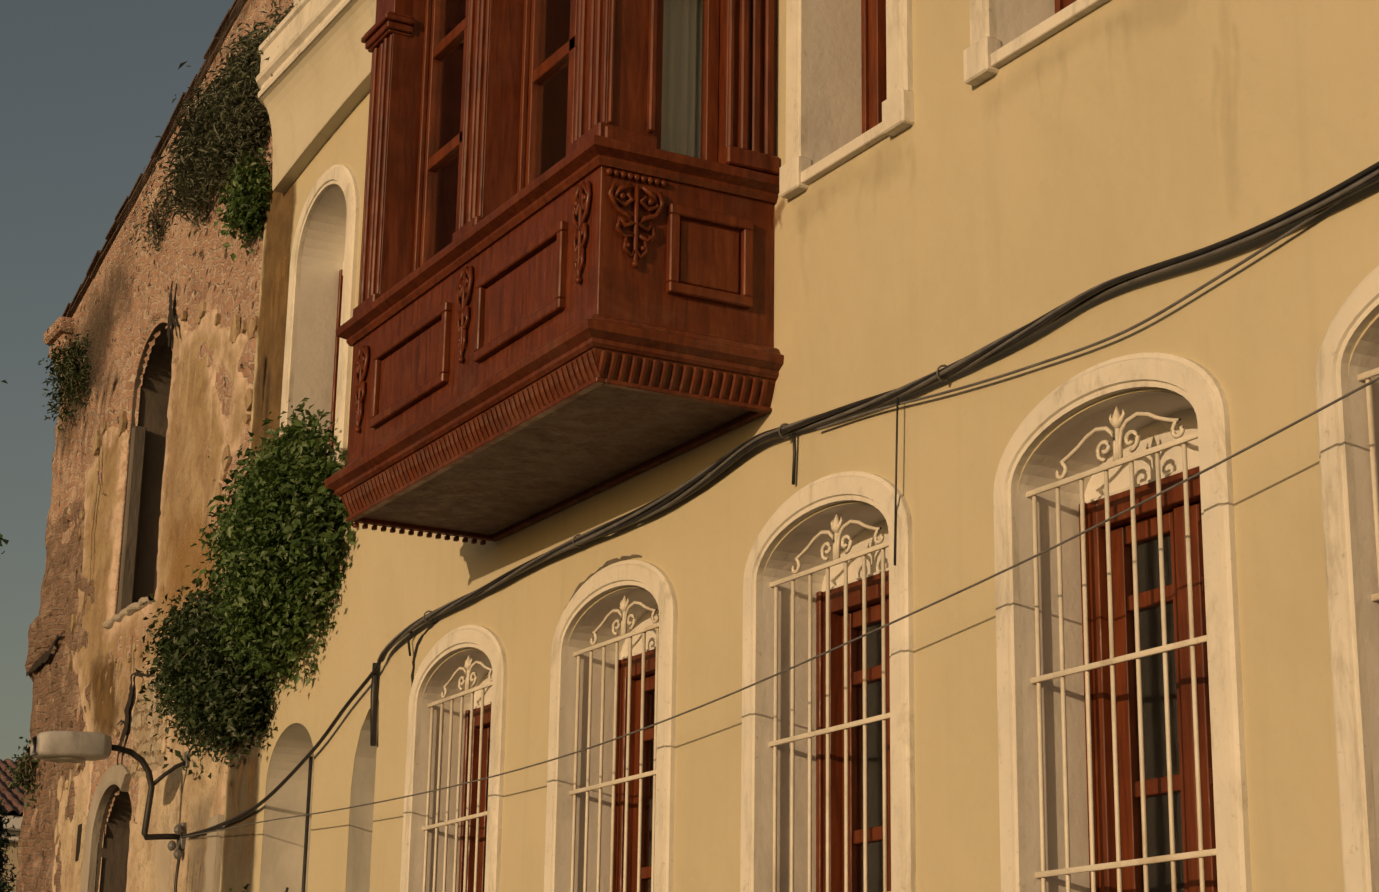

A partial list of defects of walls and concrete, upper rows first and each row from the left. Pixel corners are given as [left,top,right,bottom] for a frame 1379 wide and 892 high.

flaking render [16,0,294,892]